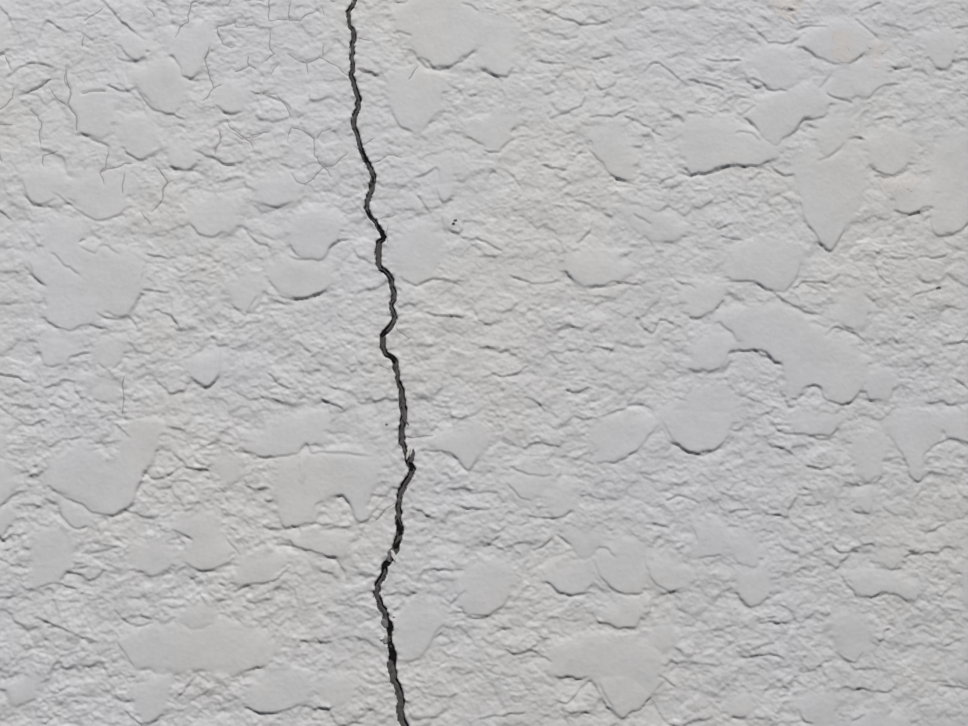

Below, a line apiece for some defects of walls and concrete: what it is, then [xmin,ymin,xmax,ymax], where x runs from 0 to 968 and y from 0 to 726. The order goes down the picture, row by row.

crack [175,0,199,37]
crack [204,0,433,726]
crack [119,377,127,414]